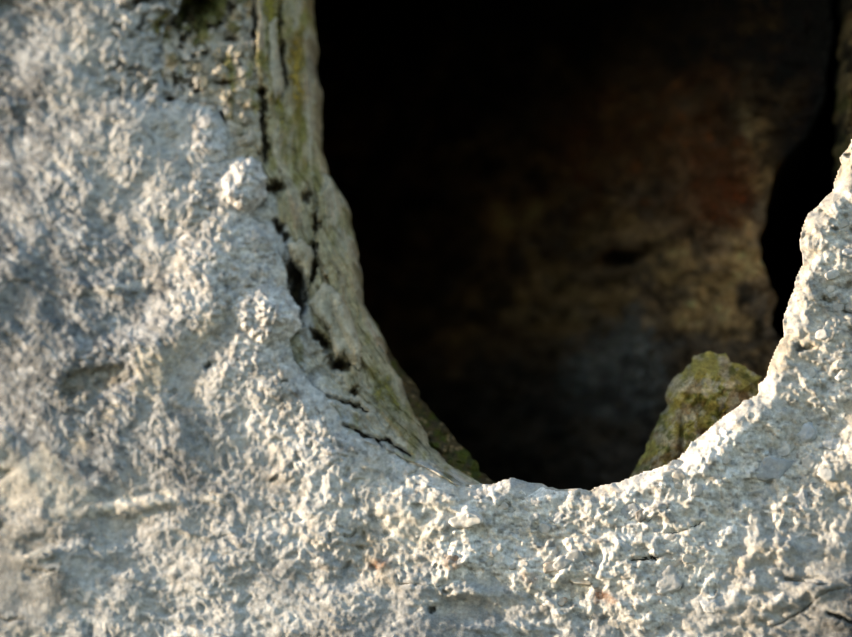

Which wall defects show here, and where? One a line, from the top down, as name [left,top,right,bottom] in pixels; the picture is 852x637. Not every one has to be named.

spalling [213,44,255,147]
peeling [268,17,283,101]
spalling [158,143,366,462]
spalling [372,191,852,637]
crack [773,579,852,627]